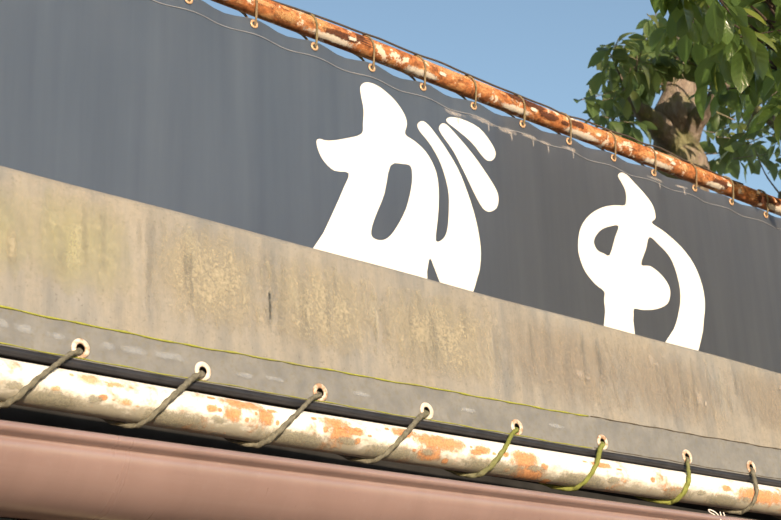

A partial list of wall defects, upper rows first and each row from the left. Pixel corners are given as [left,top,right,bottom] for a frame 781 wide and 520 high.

corrosion [70,373,138,407]
corrosion [207,396,280,425]
corrosion [311,417,372,444]
corrosion [385,427,550,483]
corrosion [723,485,781,504]